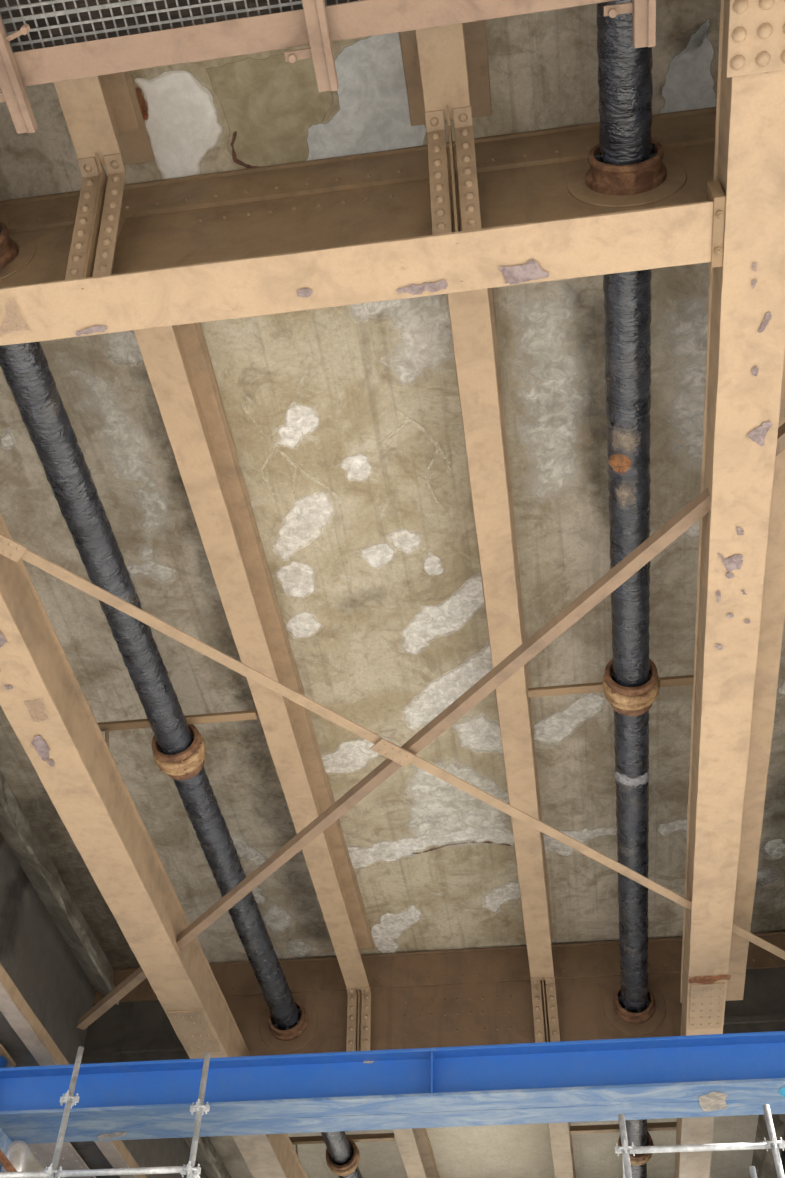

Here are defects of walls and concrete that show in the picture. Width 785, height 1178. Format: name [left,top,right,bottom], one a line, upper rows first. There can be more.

peeling [660,19,716,114]
peeling [135,32,426,180]
peeling [396,280,447,295]
damp [278,405,319,448]
peeling [748,421,773,446]
damp [273,493,334,597]
peeling [718,554,743,579]
damp [402,576,484,654]
damp [403,645,493,729]
damp [321,737,389,773]
damp [371,905,421,954]
peeling [698,1091,728,1111]